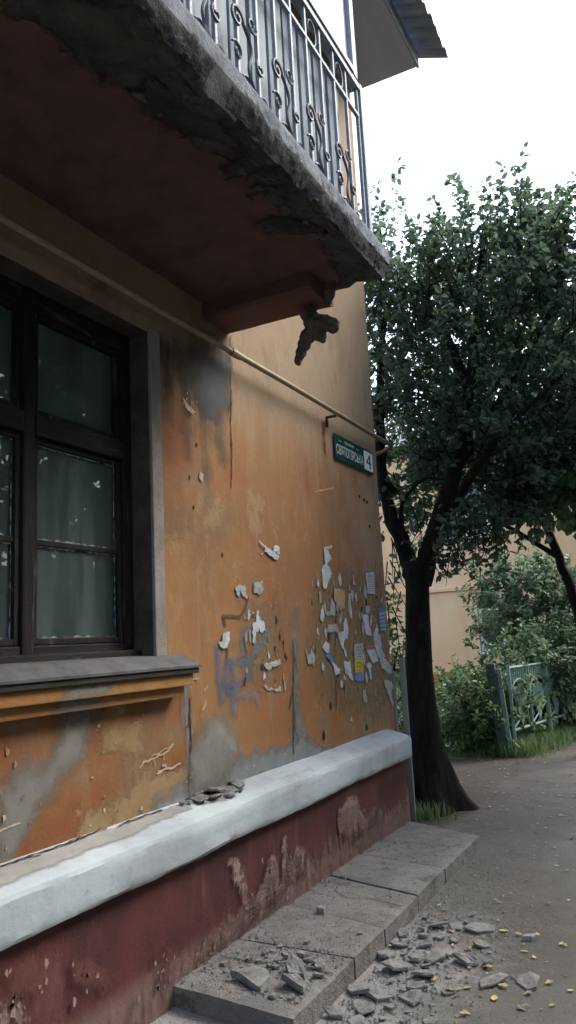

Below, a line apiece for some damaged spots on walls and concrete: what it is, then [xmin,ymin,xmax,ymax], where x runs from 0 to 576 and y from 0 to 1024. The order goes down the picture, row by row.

spalling [218,82,309,195]
spalling [313,181,388,280]
leakage [160,340,228,422]
spalling [294,305,340,366]
peeling [244,601,287,690]
peeling [308,576,389,730]
crack [0,809,162,867]
peeling [0,708,327,886]
peeling [129,794,410,1024]